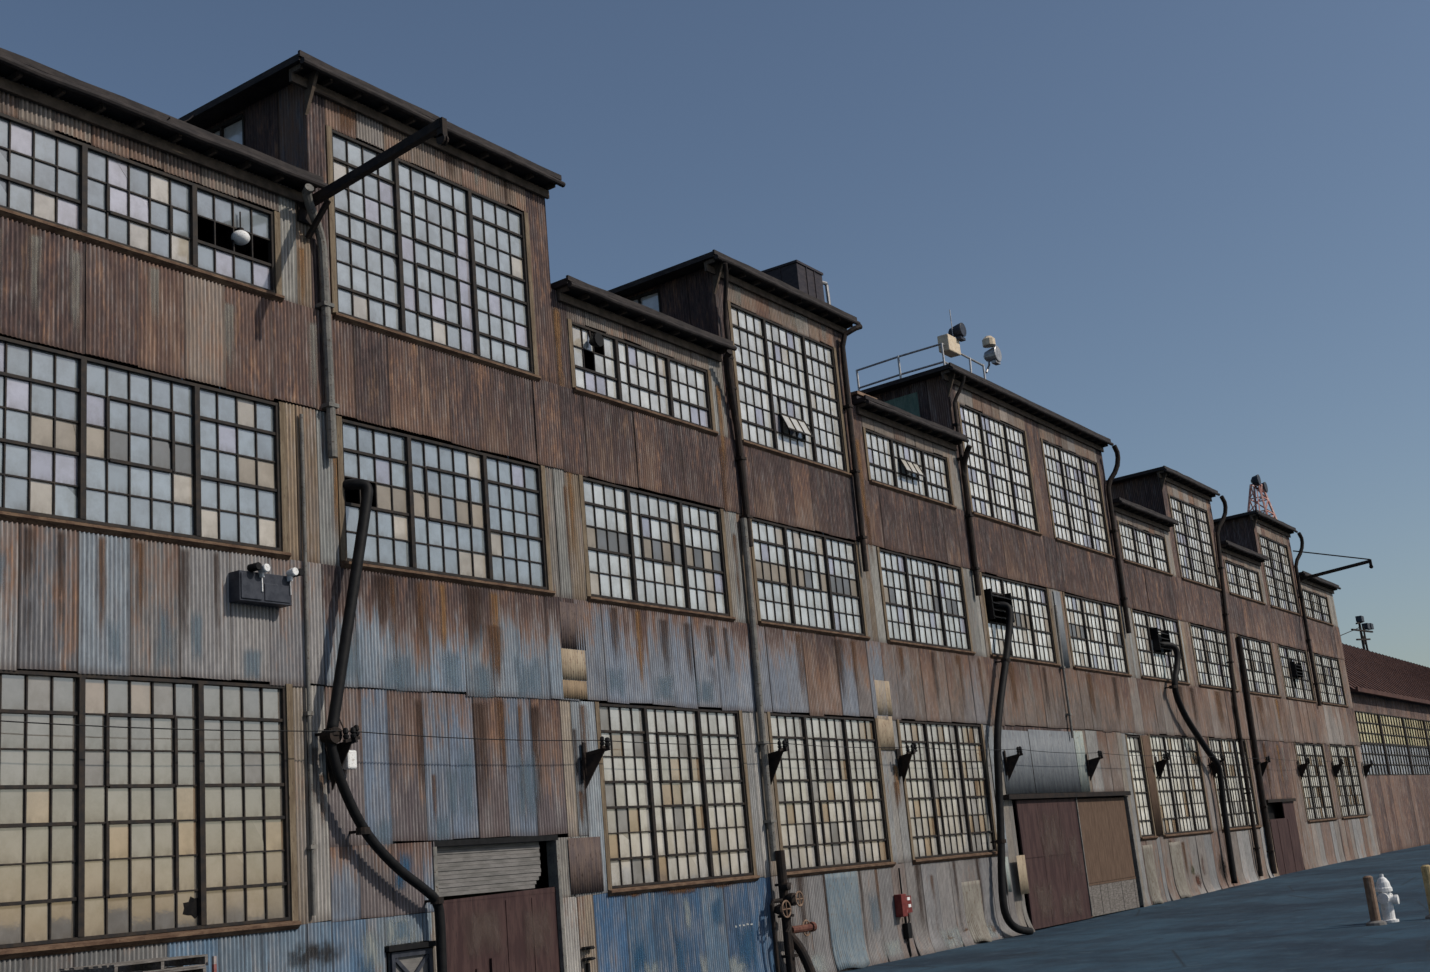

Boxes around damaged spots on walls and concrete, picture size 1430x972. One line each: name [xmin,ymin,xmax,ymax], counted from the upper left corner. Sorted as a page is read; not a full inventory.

rust [834,640,858,688]
rust [416,702,436,812]
rust [475,702,540,785]